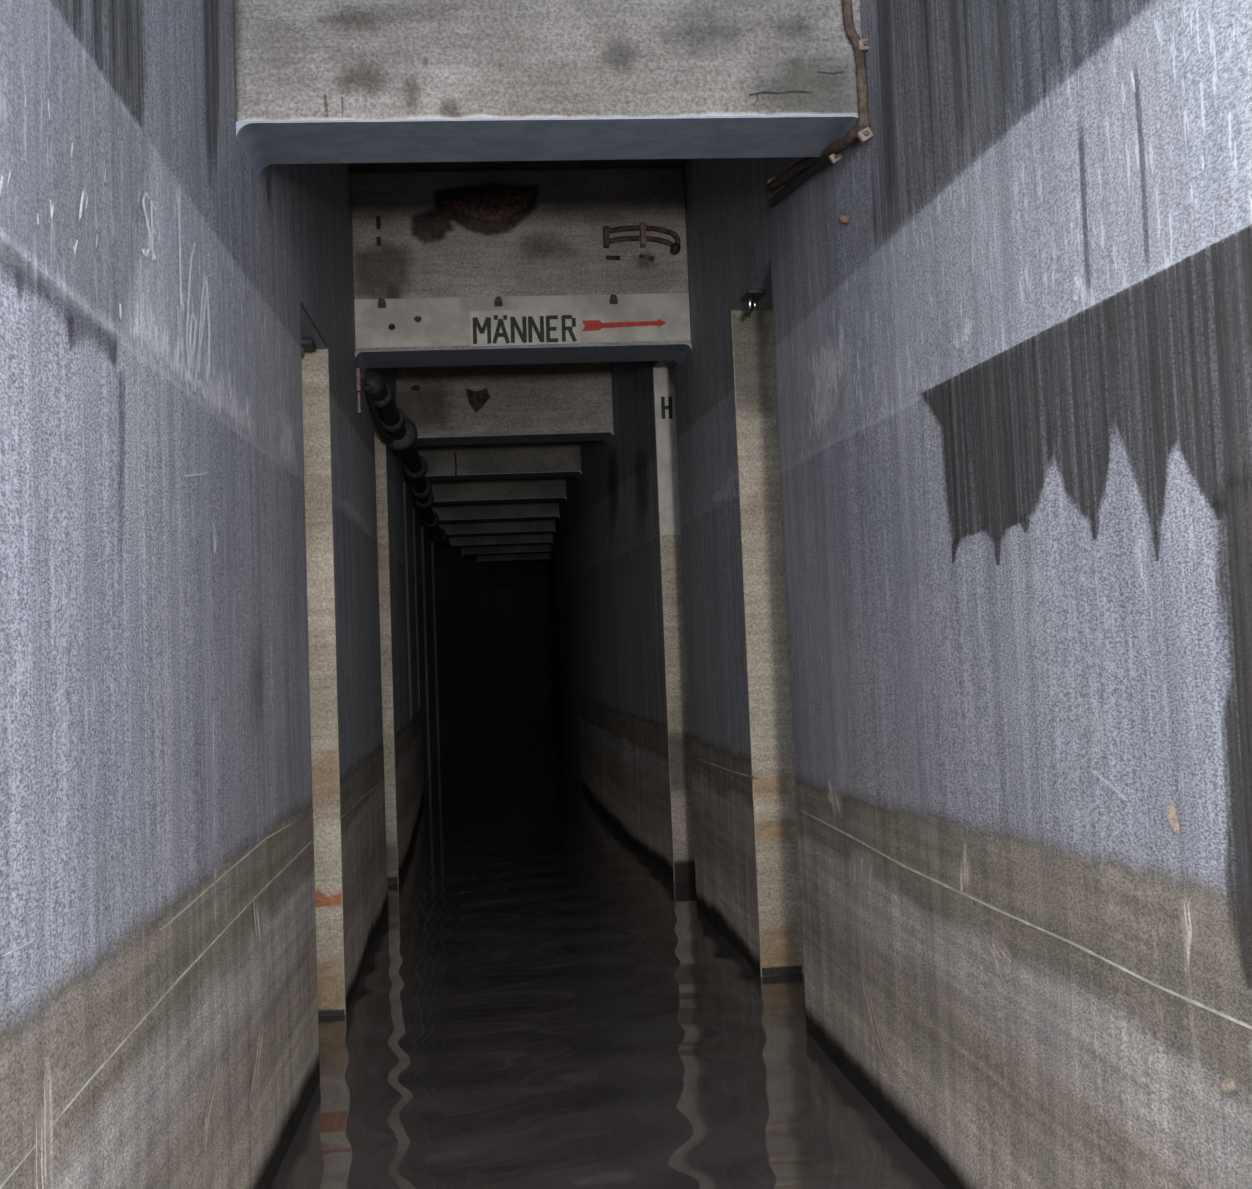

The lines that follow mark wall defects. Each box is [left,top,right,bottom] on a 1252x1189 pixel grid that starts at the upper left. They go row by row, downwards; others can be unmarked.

water stain [3,248,51,298]
water stain [67,287,254,439]
water stain [579,144,1252,1189]
rust [315,892,342,908]